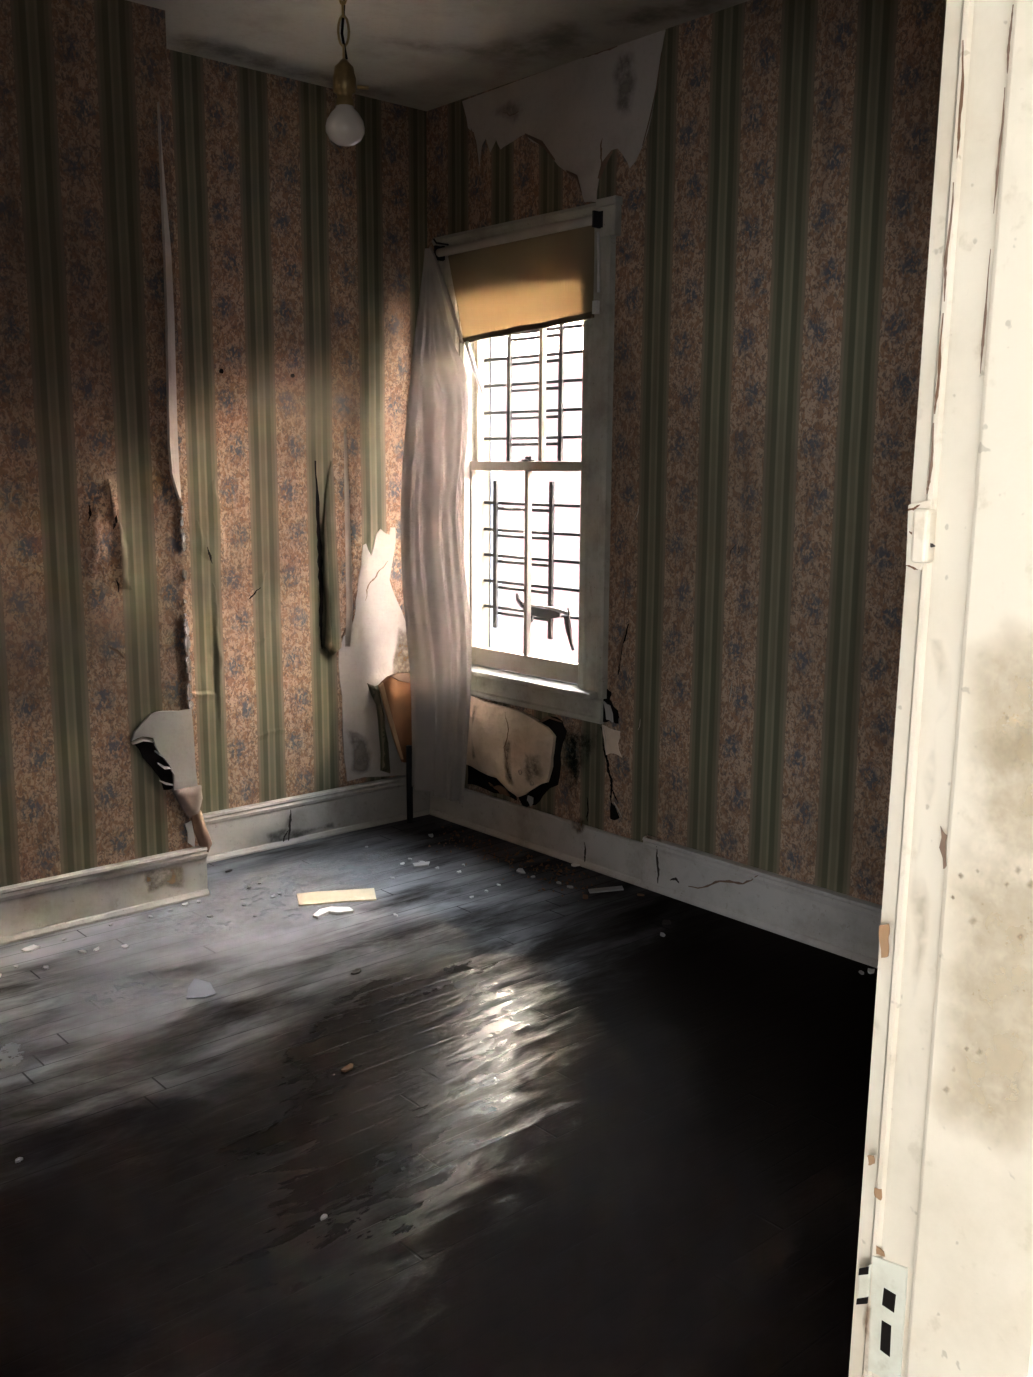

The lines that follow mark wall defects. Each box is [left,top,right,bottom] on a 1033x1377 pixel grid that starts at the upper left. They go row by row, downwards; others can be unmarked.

flaking render [462,30,666,202]
flaking render [157,101,182,501]
flaking render [338,527,410,781]
flaking render [131,709,212,852]
crack [656,846,758,889]